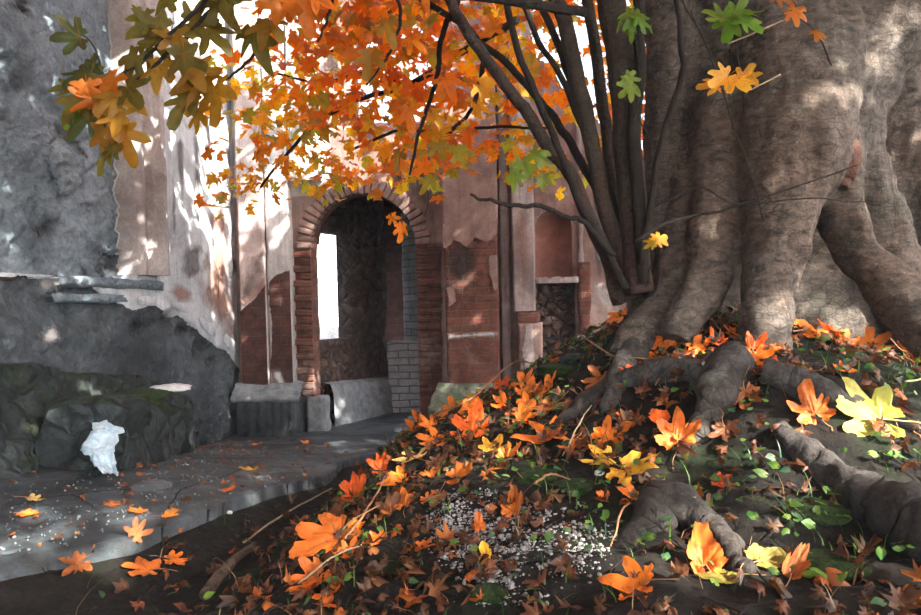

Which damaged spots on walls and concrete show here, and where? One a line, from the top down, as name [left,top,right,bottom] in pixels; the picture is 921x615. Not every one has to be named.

damp [195,94,232,217]
peeling [442,216,498,248]
peeling [489,255,498,290]
peeling [138,296,158,306]
peeling [239,278,265,304]
peeling [446,286,456,307]
peeling [224,334,235,351]